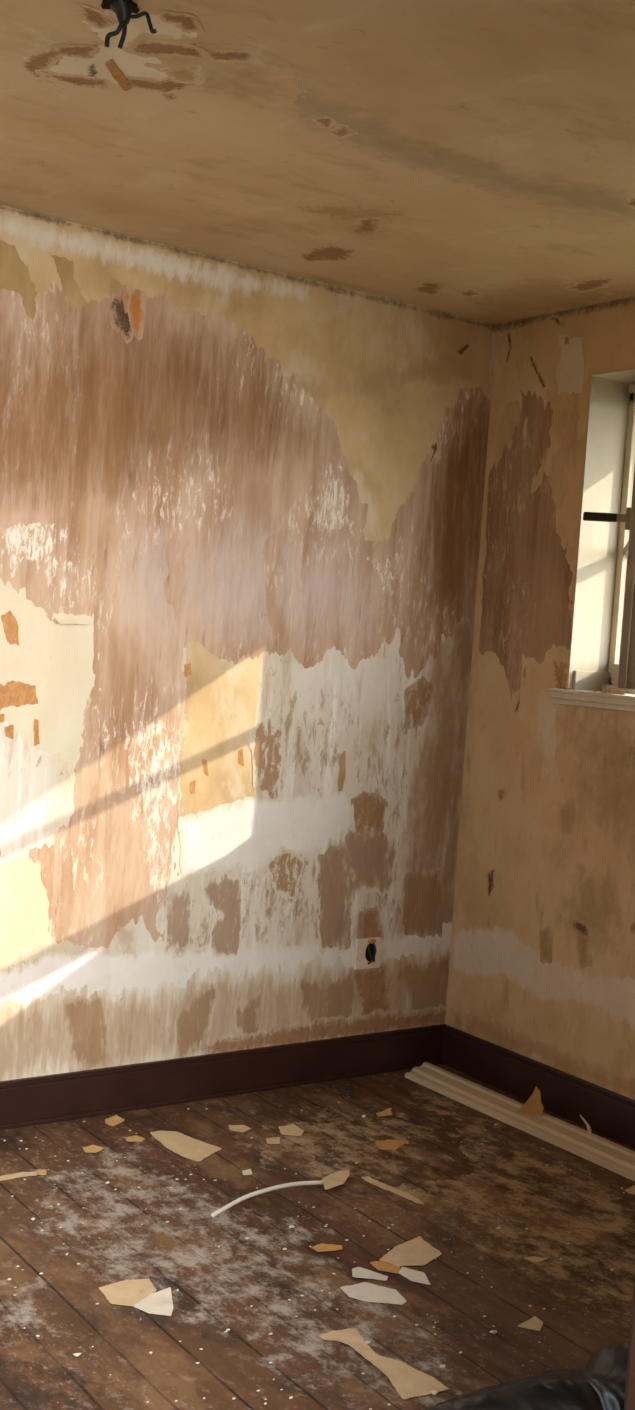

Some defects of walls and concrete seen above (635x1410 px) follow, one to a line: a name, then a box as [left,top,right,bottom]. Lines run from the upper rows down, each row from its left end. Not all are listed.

peeling [19,3,255,102]
peeling [0,240,37,320]
peeling [50,255,88,309]
peeling [0,457,414,780]
peeling [121,705,208,914]